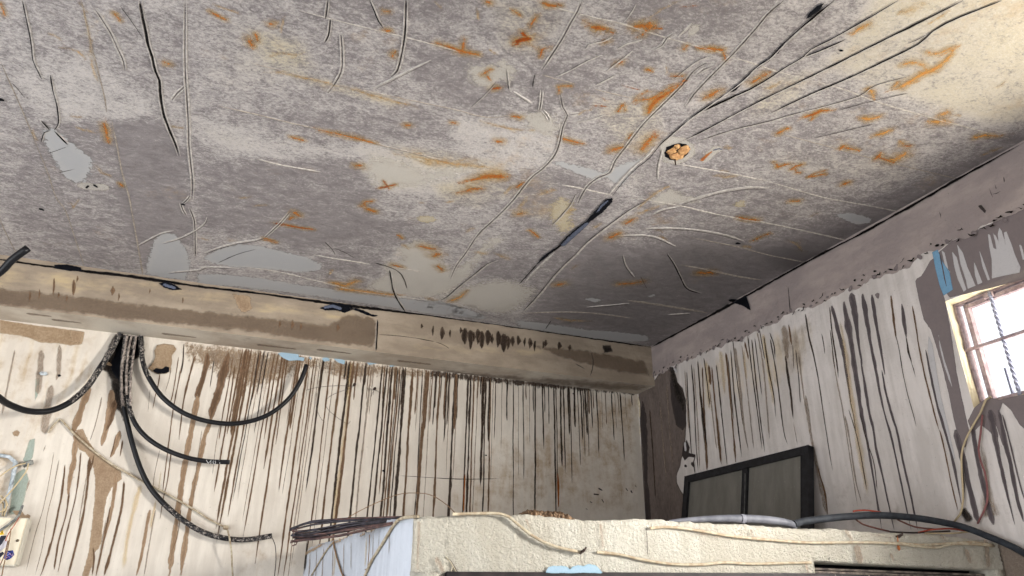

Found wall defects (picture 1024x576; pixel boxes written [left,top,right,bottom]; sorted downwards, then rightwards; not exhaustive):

crack [12,1,70,173]
crack [93,0,290,274]
rust [457,166,508,193]
crack [441,0,692,301]
rust [595,75,685,114]
spalling [660,137,722,165]
crack [520,0,1002,328]
rust [893,48,954,90]
water stain [0,276,647,576]
water stain [685,293,917,529]
peeling [626,204,1024,525]
water stain [890,296,939,429]